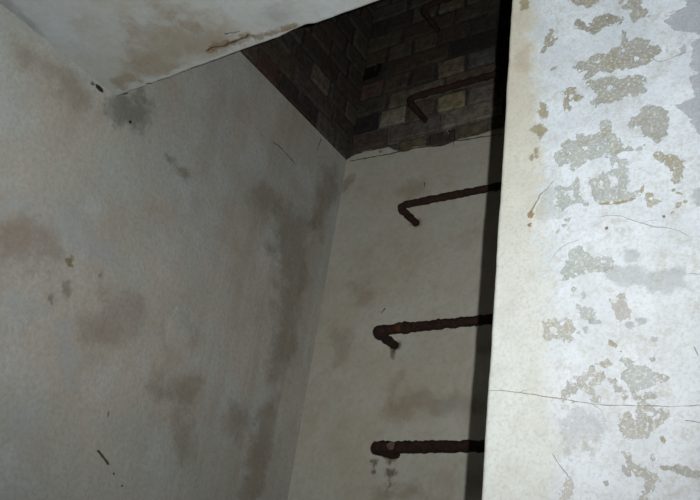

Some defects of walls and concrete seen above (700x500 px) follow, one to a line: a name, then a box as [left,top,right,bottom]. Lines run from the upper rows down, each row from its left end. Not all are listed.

peeling [664,0,700,34]
crack [206,31,249,51]
peeling [540,29,558,53]
peeling [562,0,668,112]
peeling [676,72,700,134]
peeling [554,105,688,233]
peeling [560,245,614,281]
peeling [542,287,598,343]
peeling [609,290,631,321]
crack [492,389,700,423]
peeling [559,340,700,500]